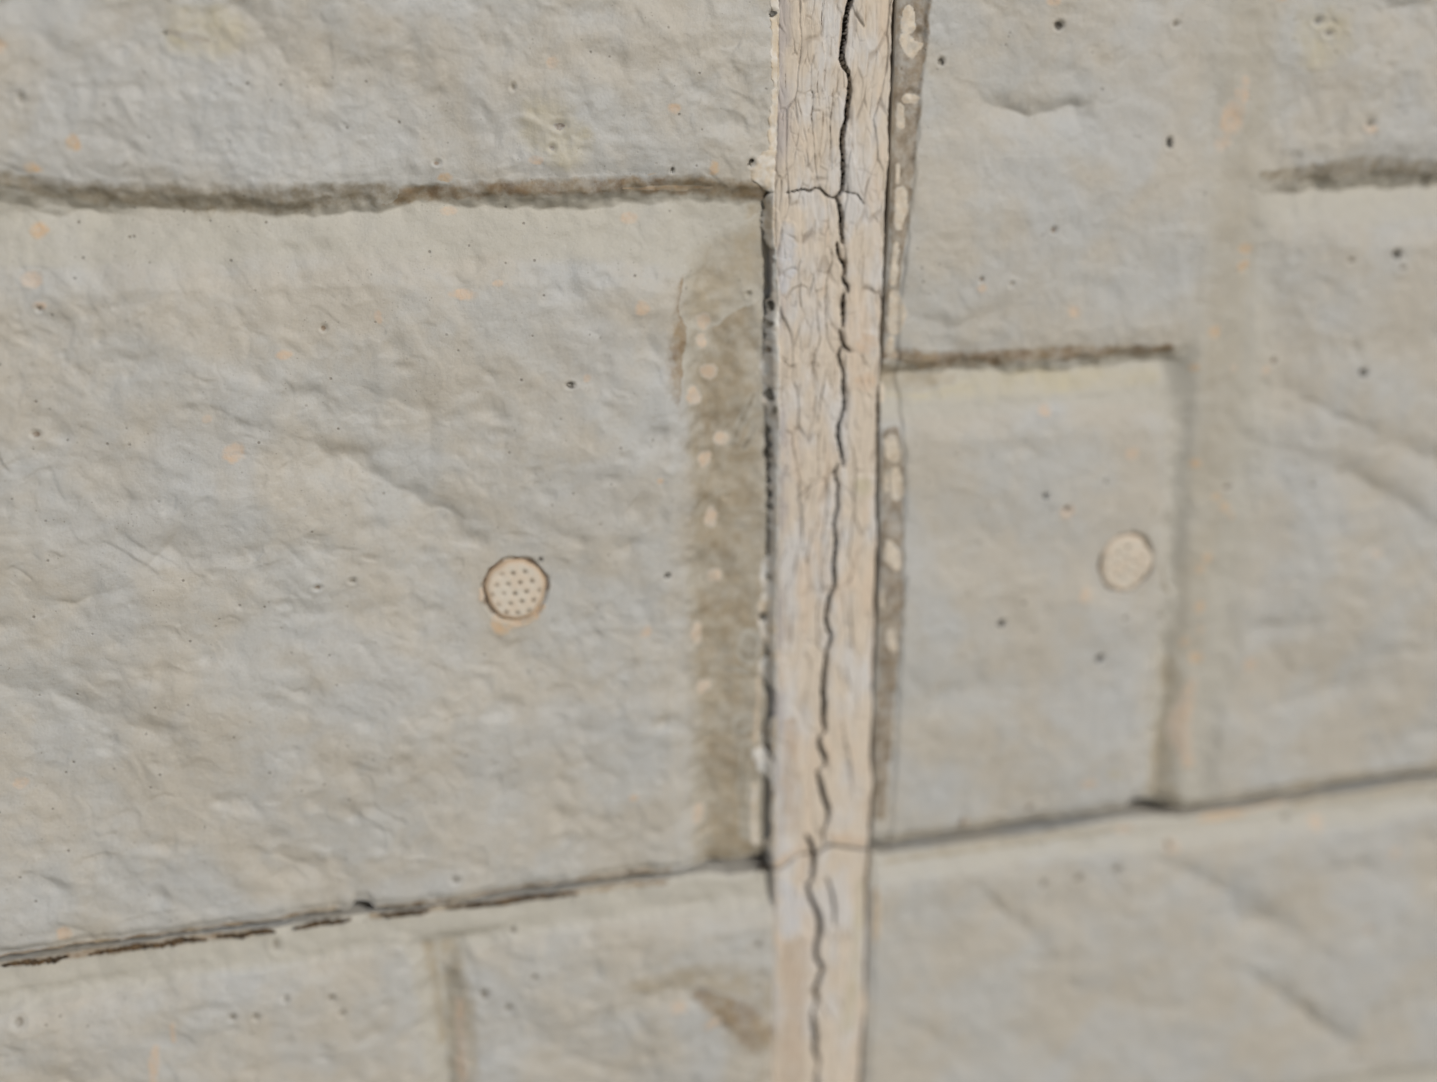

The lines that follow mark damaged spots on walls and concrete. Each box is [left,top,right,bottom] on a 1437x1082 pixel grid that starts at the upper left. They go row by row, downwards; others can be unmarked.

peeling [899,5,923,58]
peeling [895,93,920,129]
peeling [884,163,909,354]
peeling [882,434,904,501]
crack [758,0,895,1082]
peeling [885,540,903,571]
peeling [886,629,898,652]